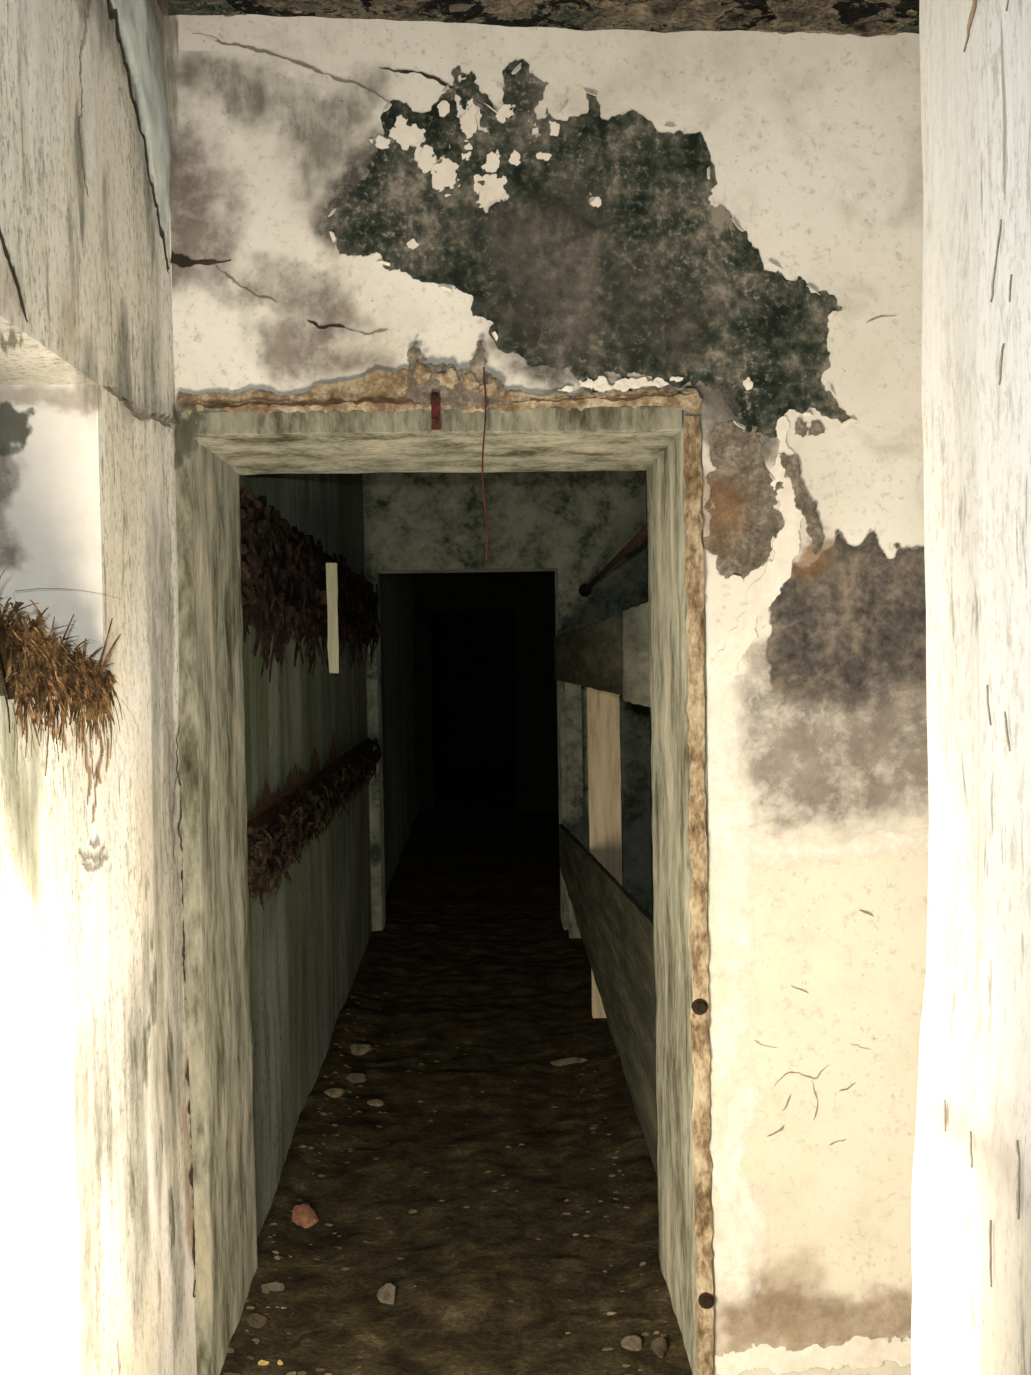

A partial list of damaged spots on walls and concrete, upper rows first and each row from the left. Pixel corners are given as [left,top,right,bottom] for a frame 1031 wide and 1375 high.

water stain [217,68,265,113]
crack [193,33,486,108]
water stain [76,115,84,190]
crack [78,0,277,303]
water stain [294,103,360,169]
water stain [152,134,231,280]
water stain [121,318,130,395]
water stain [263,287,361,376]
crack [307,320,387,335]
peeling [176,59,856,677]
water stain [707,530,929,1307]